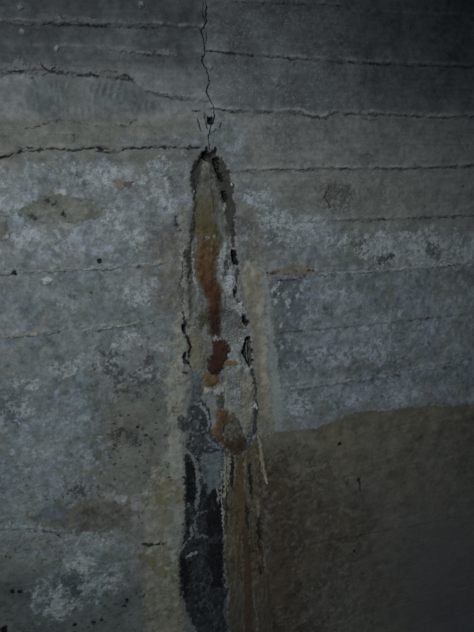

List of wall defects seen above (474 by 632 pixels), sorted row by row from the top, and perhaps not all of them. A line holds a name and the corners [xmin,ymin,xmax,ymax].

crack [0,2,253,159]
spalling [189,146,236,241]
corrosion [194,222,237,395]
corrosion [211,409,229,445]
damp [0,152,474,632]